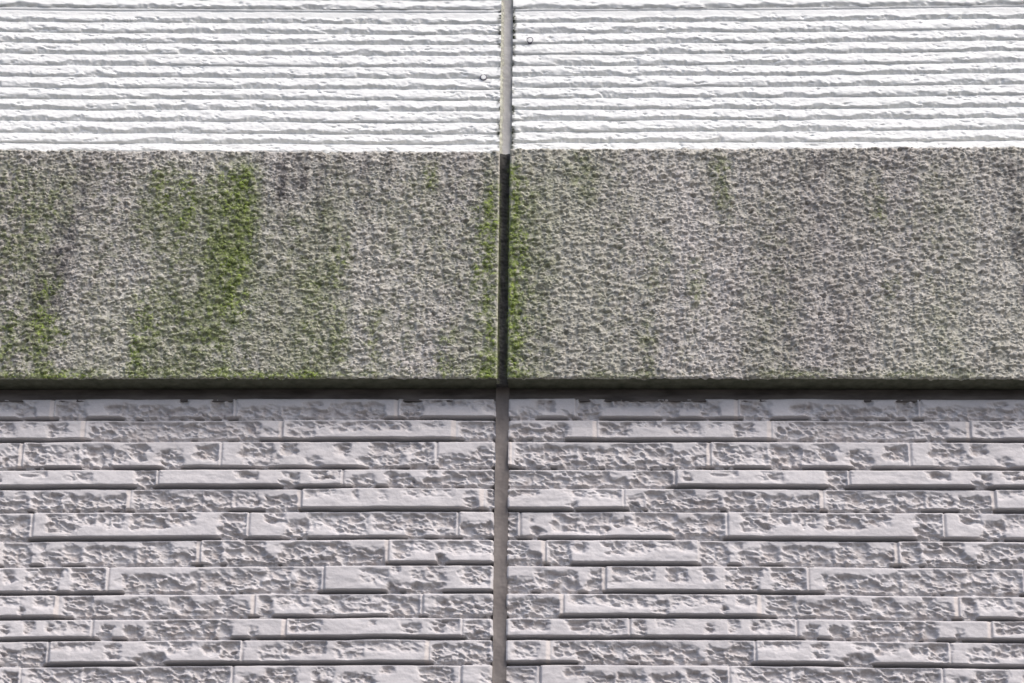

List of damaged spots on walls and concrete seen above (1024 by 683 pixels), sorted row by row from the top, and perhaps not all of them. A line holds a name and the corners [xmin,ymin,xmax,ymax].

leakage [0,174,86,380]
leakage [128,165,253,379]
leakage [474,166,533,379]